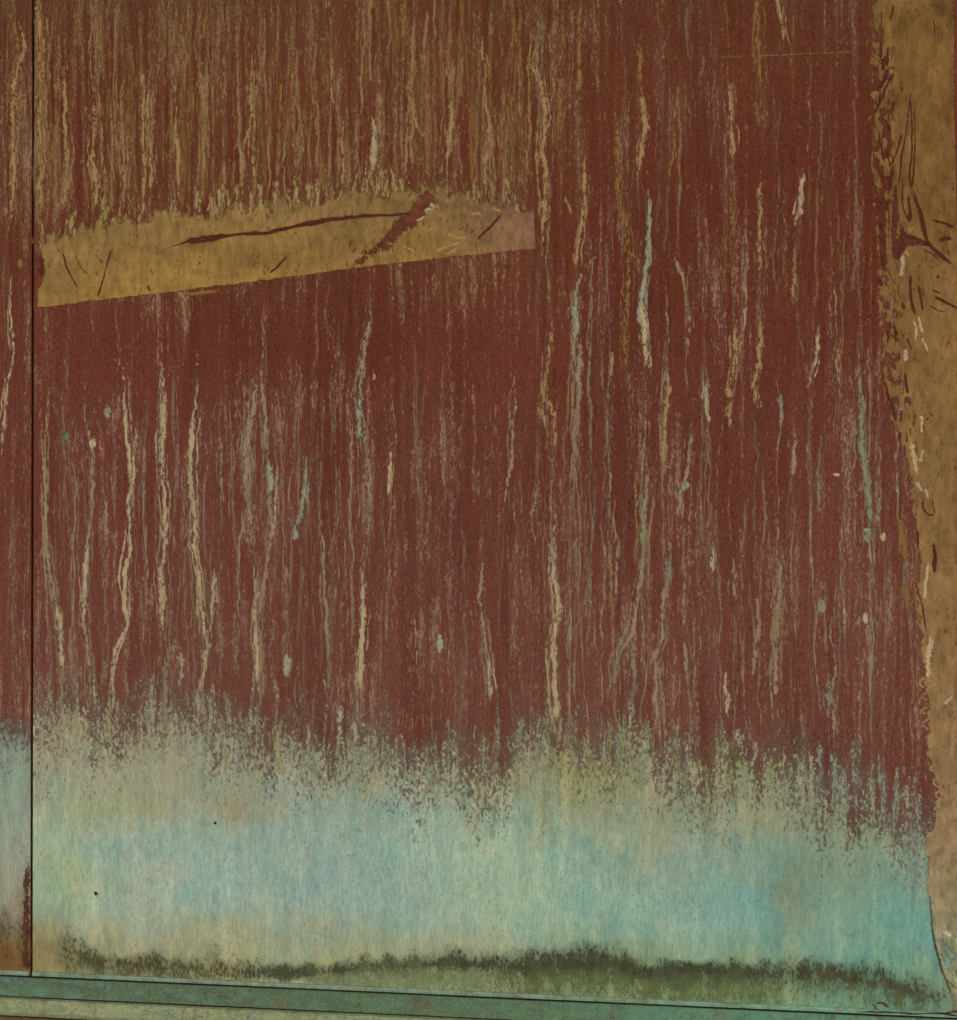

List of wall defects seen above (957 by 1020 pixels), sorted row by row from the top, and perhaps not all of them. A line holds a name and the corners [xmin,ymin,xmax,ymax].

damp [459,0,583,256]
damp [727,66,740,159]
damp [792,168,806,226]
damp [572,155,596,337]
damp [724,182,765,433]
damp [808,199,864,414]
peeling [903,315,928,361]
peeling [909,442,929,498]
peeling [283,655,293,677]
damp [0,259,957,1013]
peeling [902,561,930,626]
peeling [924,634,934,681]